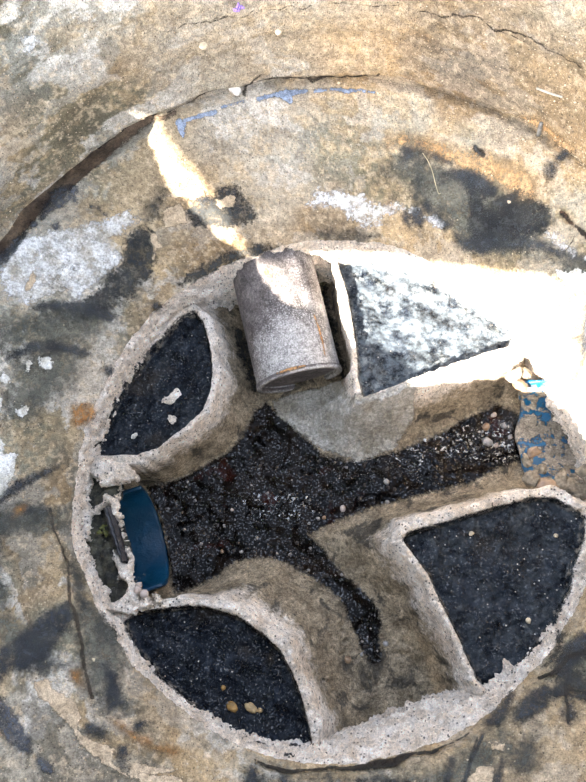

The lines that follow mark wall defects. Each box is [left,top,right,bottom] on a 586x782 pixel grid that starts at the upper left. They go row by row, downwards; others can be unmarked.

crack [373,4,583,69]
crack [242,73,380,97]
crack [399,146,452,164]
crack [473,145,485,158]
damp [177,243,279,288]